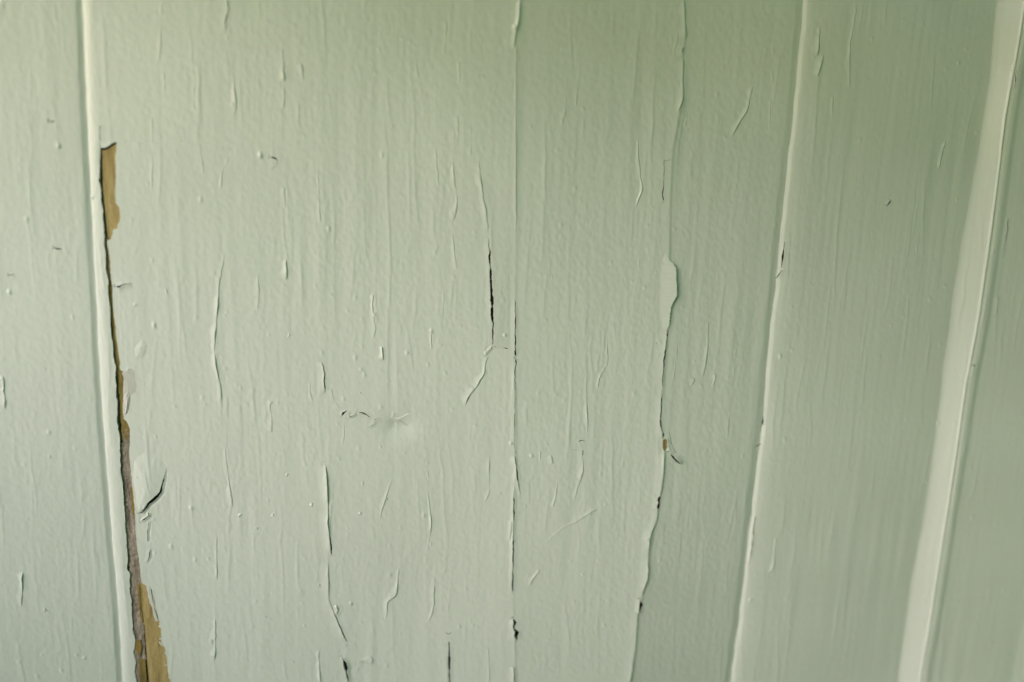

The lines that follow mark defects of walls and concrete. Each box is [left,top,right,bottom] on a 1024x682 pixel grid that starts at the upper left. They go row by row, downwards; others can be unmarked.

peeling [122,369,137,416]
crack [623,304,685,682]
peeling [148,585,158,621]